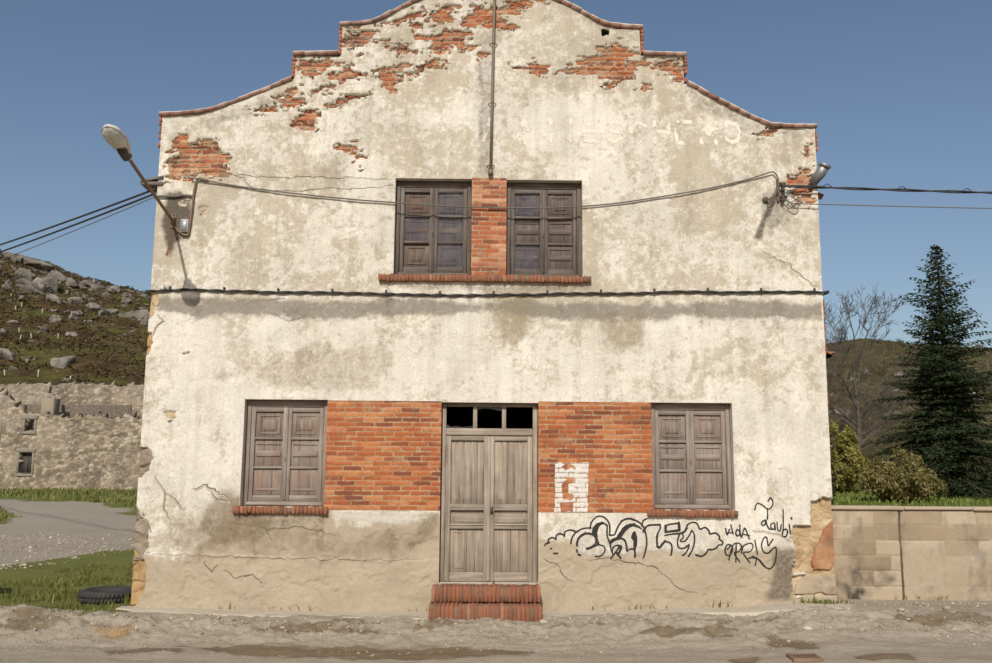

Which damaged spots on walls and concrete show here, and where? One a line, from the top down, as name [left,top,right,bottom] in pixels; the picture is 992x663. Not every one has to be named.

spalling [253,0,550,133]
spalling [510,29,683,97]
spalling [163,129,233,184]
spalling [333,141,367,172]
spalling [785,168,817,210]
flaking render [131,507,152,607]
crack [148,476,412,583]
crack [594,557,696,593]
flaking render [789,496,836,598]